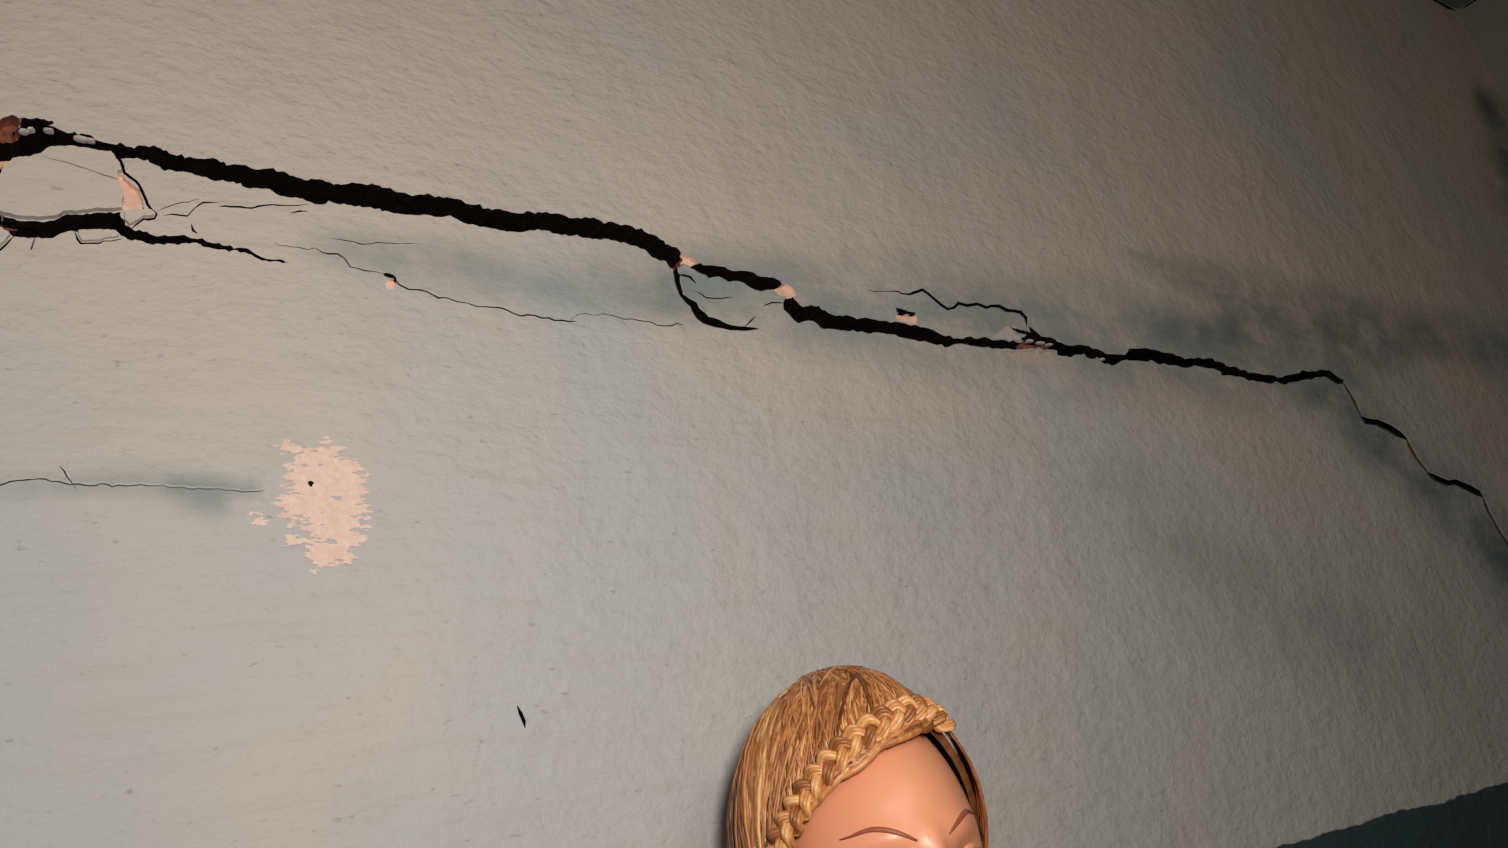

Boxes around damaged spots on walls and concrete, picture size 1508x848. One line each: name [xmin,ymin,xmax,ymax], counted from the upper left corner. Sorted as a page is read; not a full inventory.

flaking render [0,115,54,168]
flaking render [73,135,95,144]
water stain [681,275,741,294]
crack [0,118,1508,547]
water stain [1056,335,1076,346]
peeling [247,436,374,574]